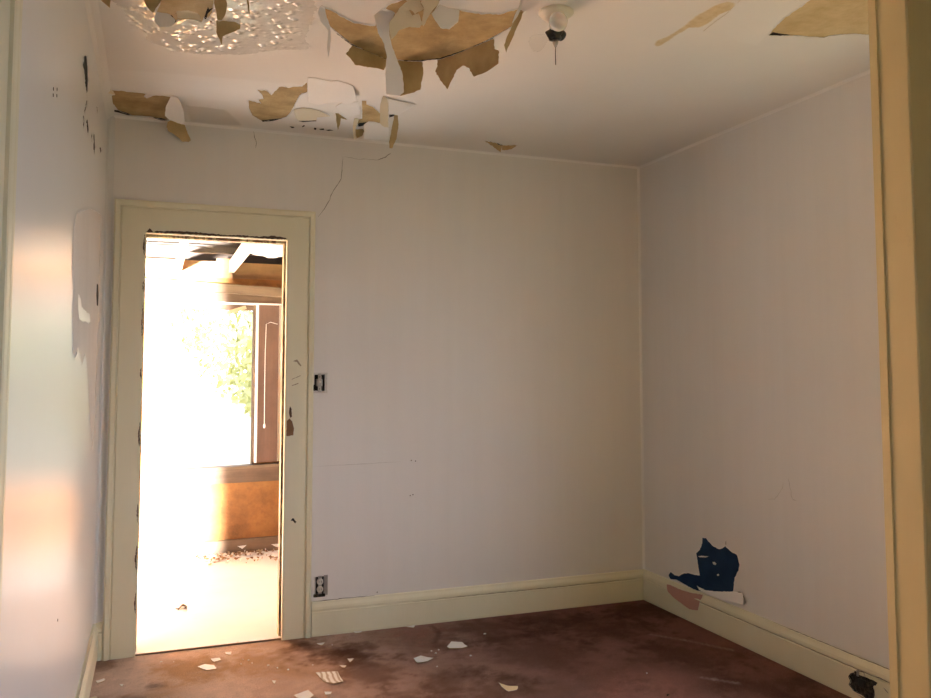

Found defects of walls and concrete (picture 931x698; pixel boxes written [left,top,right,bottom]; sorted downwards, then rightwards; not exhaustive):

peeling [144,0,241,45]
peeling [704,0,869,46]
peeling [247,0,526,148]
peeling [109,89,191,142]
peeling [484,140,519,153]
spalling [286,407,294,436]
peeling [667,536,746,610]